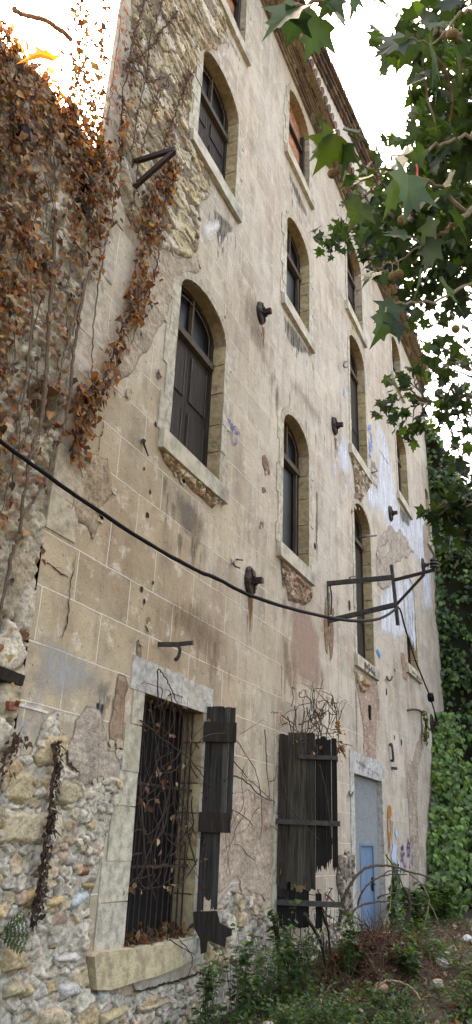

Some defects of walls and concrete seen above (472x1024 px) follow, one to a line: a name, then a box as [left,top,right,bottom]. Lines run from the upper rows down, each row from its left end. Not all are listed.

flaking render [109,0,228,399]
flaking render [71,452,117,539]
flaking render [262,455,271,493]
flaking render [351,456,378,514]
crack [45,532,92,644]
flaking render [280,559,313,606]
flaking render [376,522,431,590]
flaking render [354,669,387,761]
flaking render [0,674,356,1024]